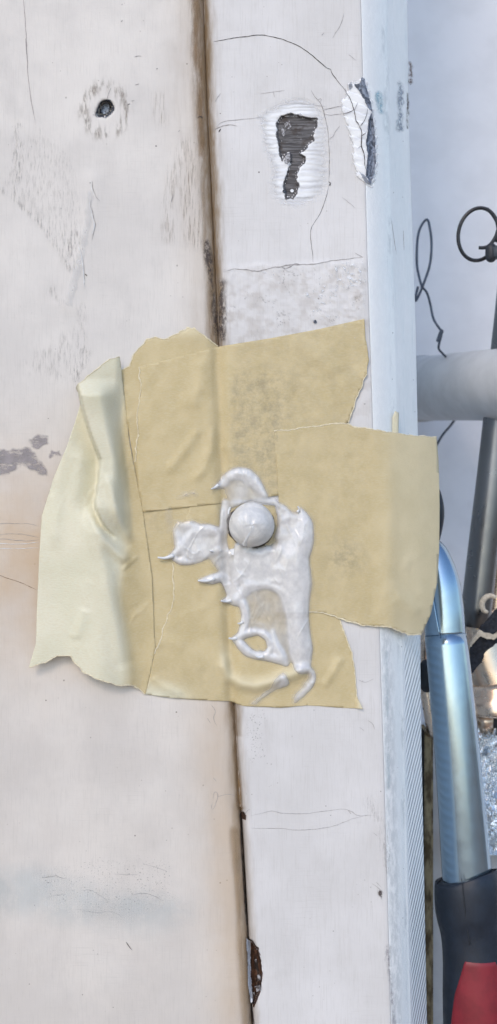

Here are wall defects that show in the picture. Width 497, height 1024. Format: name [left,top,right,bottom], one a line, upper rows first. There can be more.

spalling [96,100,114,118]
crack [214,35,345,254]
spalling [263,100,322,204]
spalling [341,77,378,187]